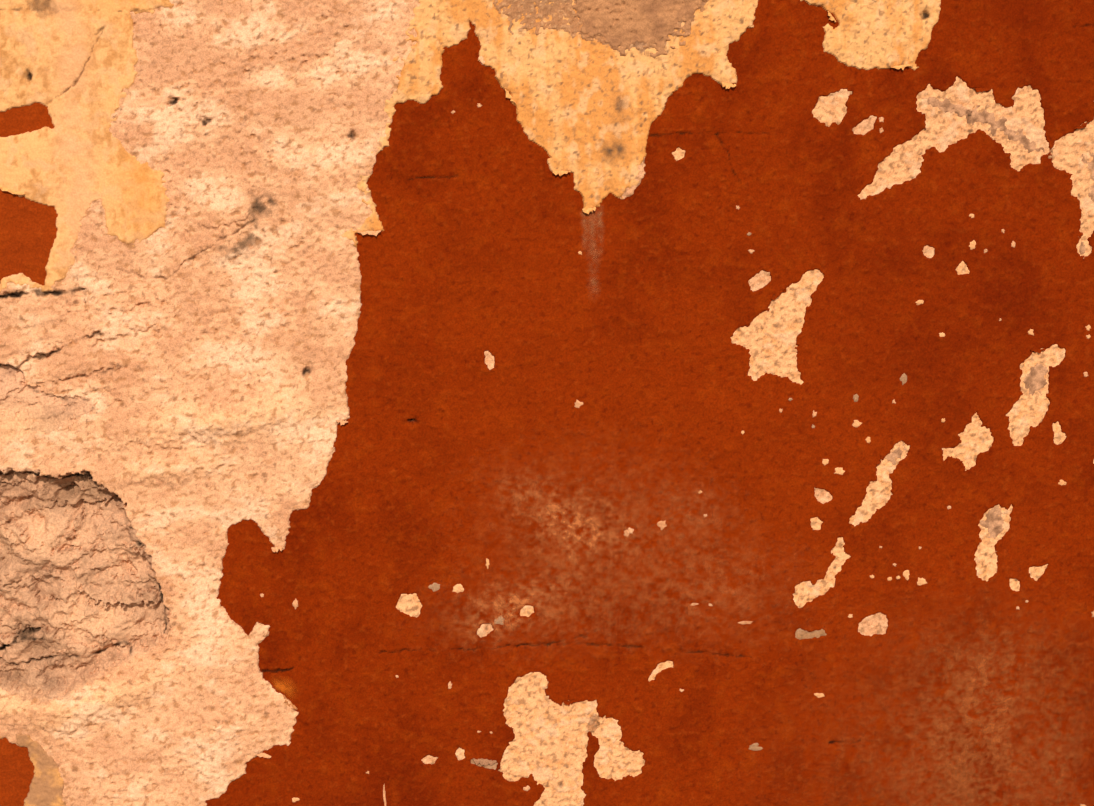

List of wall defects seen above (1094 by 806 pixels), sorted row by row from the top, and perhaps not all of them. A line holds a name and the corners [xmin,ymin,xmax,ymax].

peeling [800,0,941,71]
peeling [812,89,852,127]
peeling [858,76,1094,259]
crack [0,290,62,298]
crack [2,349,61,366]
flaking render [0,0,759,806]
peeling [731,269,824,384]
peeling [942,412,994,471]
peeling [1006,344,1066,446]
peeling [849,441,910,526]
peeling [793,537,851,608]
peeling [974,504,1013,581]